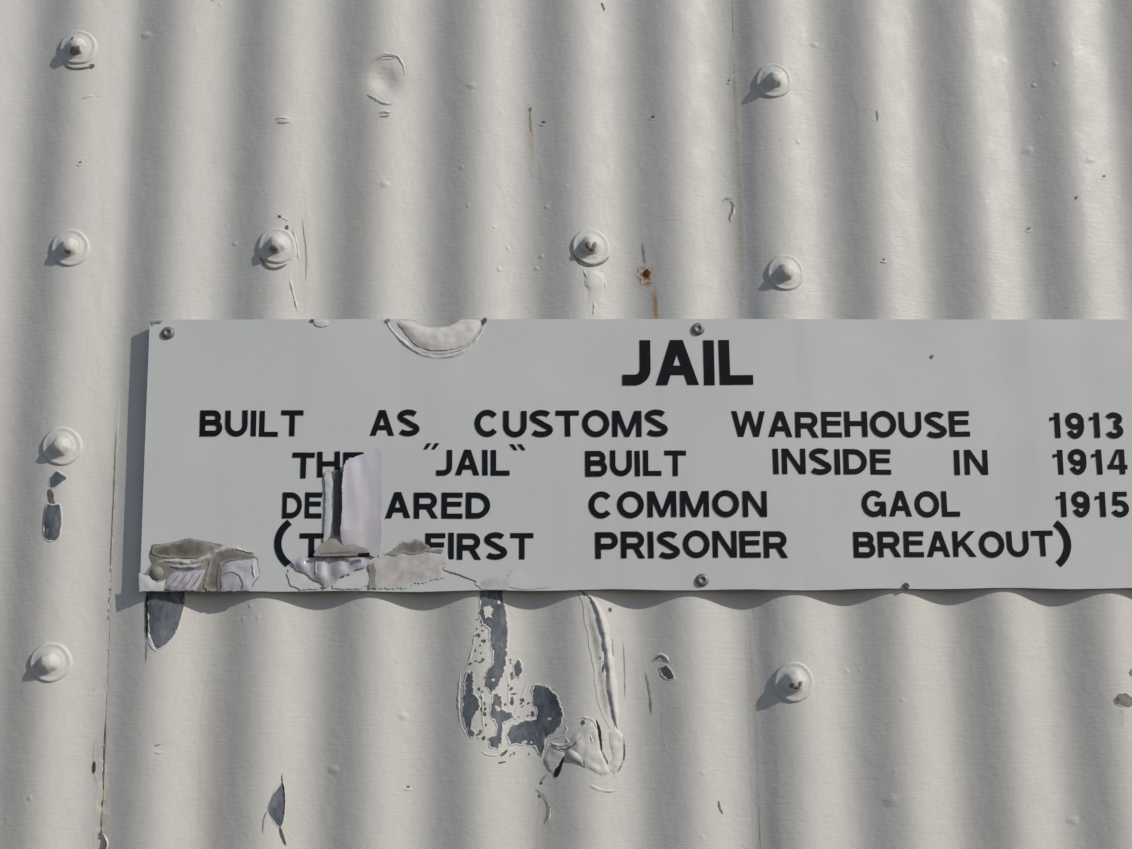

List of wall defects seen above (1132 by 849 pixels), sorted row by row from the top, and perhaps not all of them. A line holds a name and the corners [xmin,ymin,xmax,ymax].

peeling [42,470,67,542]
peeling [145,591,187,660]
peeling [457,590,626,798]
peeling [263,779,286,845]